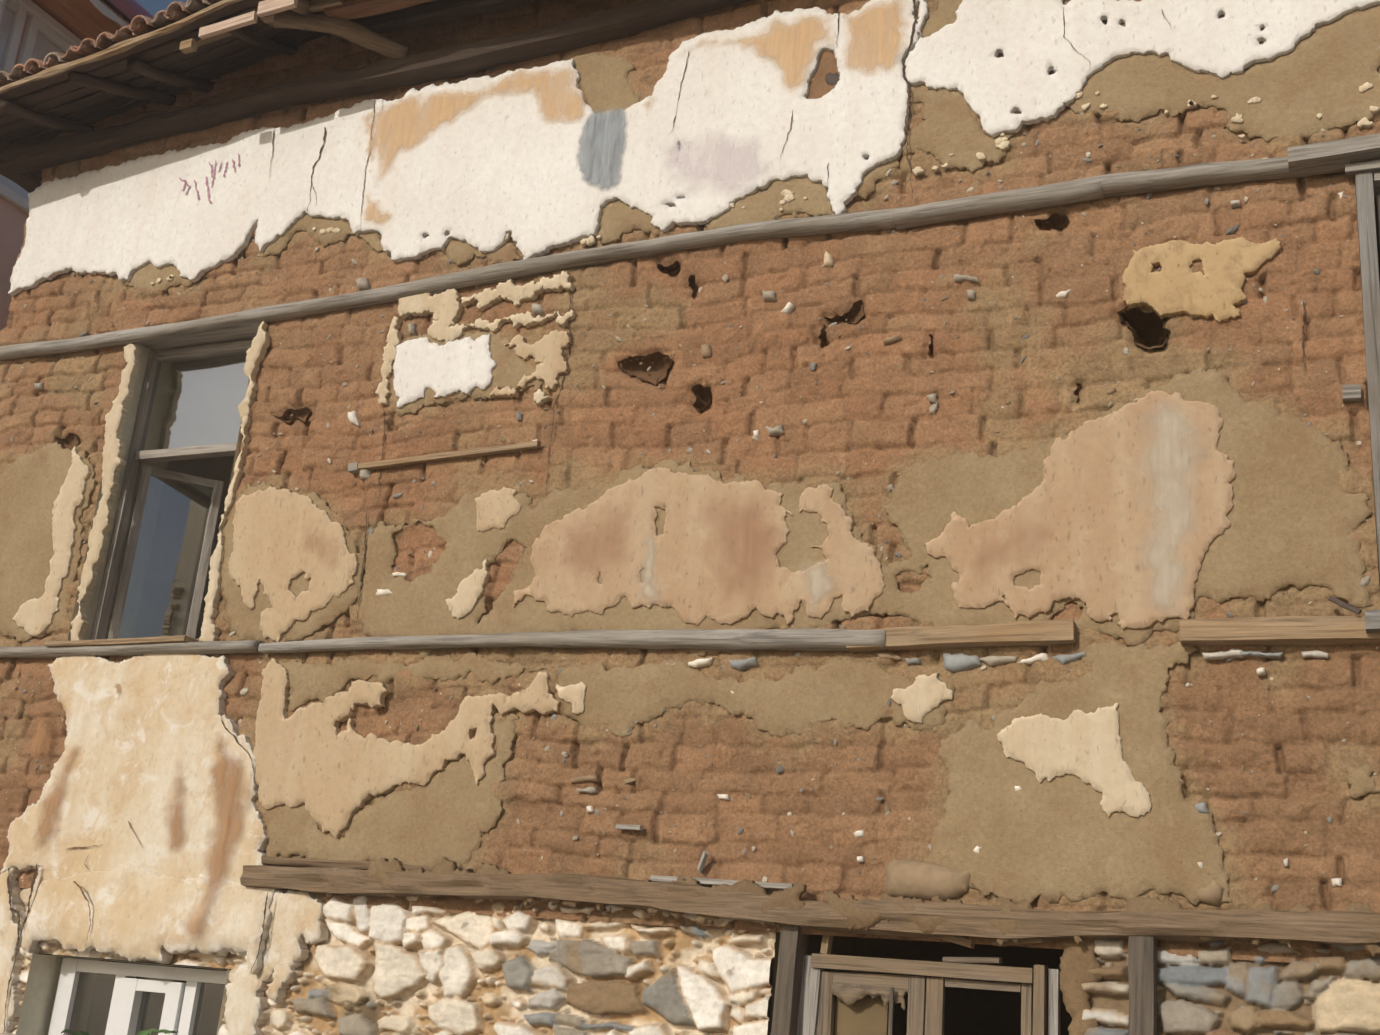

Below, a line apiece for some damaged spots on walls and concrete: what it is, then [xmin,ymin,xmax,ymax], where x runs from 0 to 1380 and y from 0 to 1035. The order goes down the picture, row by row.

crack [307,127,326,210]
flaking render [8,0,1380,417]
crack [902,0,918,193]
crack [1063,7,1091,79]
spalling [0,321,1372,1035]